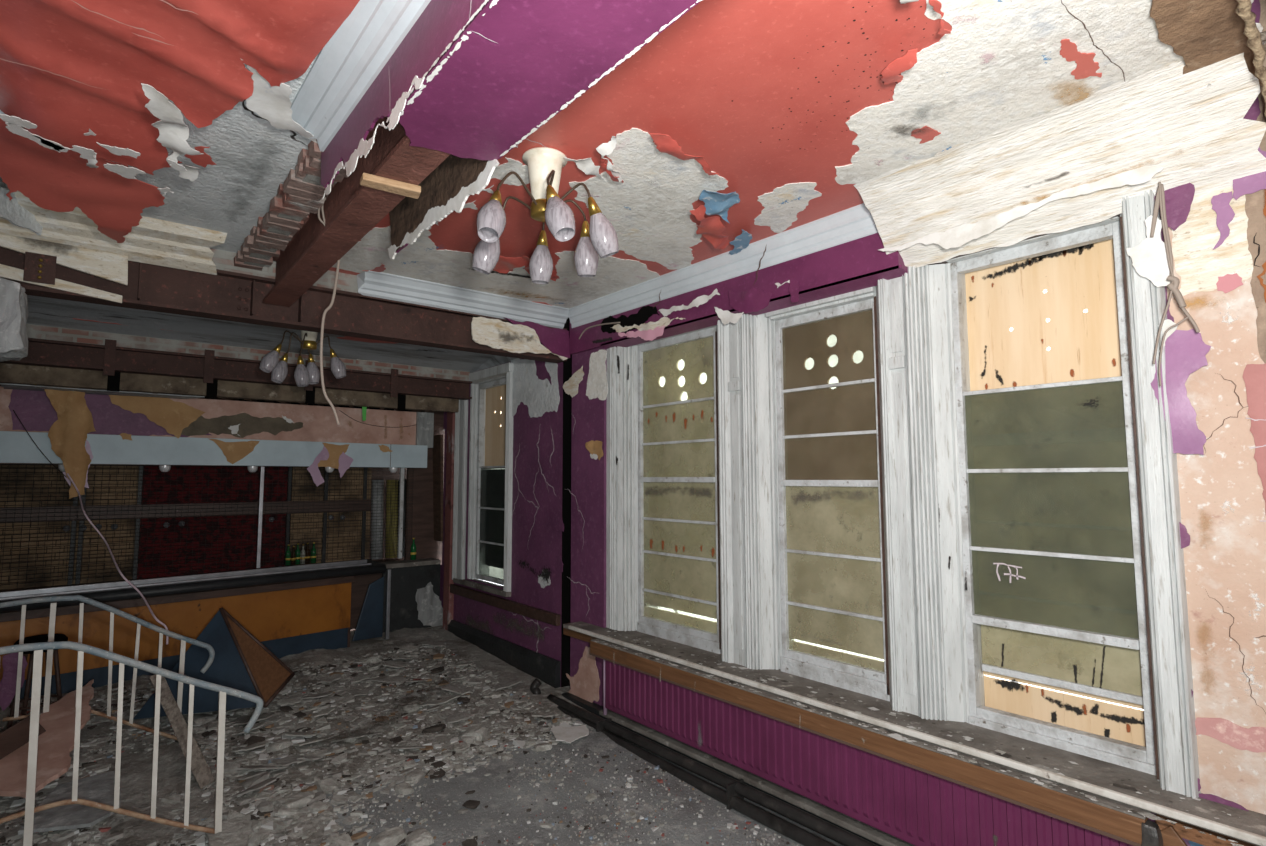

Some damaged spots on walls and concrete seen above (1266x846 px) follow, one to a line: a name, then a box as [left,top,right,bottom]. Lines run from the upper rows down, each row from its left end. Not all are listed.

peeling [0,0,360,243]
peeling [332,128,822,309]
flaking render [579,277,800,341]
peeling [44,386,96,499]
peeling [209,439,260,464]
peeling [307,443,353,487]
crack [511,416,585,549]
flaking render [511,350,608,418]
flaking render [835,0,1266,815]
flaking render [566,646,600,703]